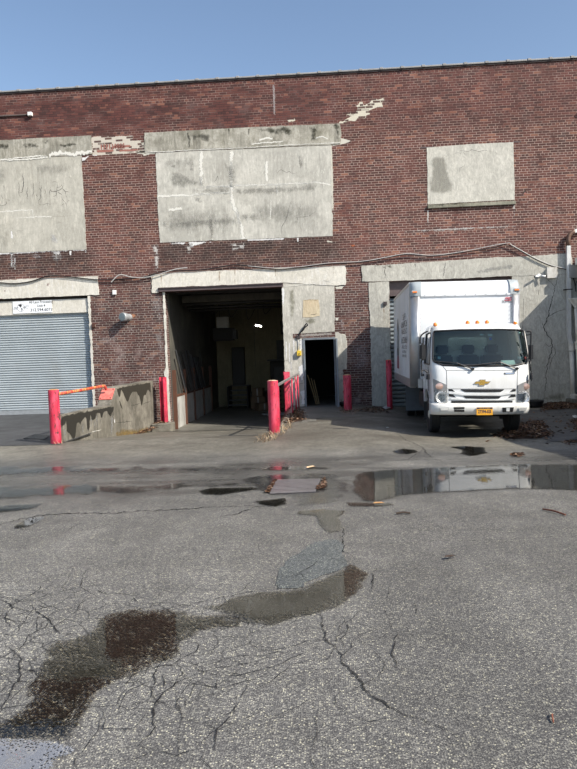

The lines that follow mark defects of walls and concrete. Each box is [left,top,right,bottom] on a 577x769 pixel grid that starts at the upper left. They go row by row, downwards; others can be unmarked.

peeling [339,98,383,123]
peeling [82,136,155,161]
crack [542,275,565,396]
water stain [62,383,151,439]